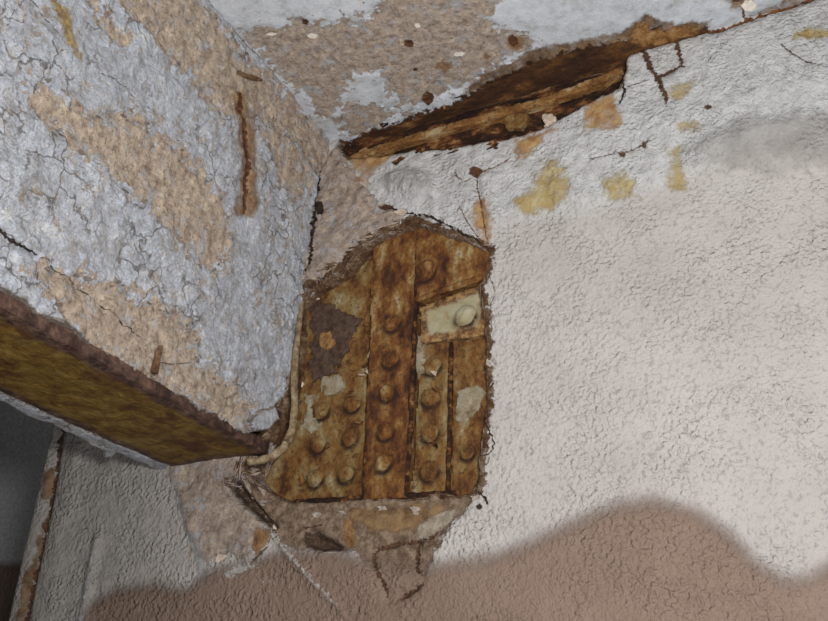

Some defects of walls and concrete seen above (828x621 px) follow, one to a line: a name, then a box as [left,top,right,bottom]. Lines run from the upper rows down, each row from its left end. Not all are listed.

rust [233,92,259,217]
rust [472,199,491,241]
rust [339,15,708,180]
rust [669,147,686,190]
crack [619,0,814,104]
peeling [17,0,543,602]